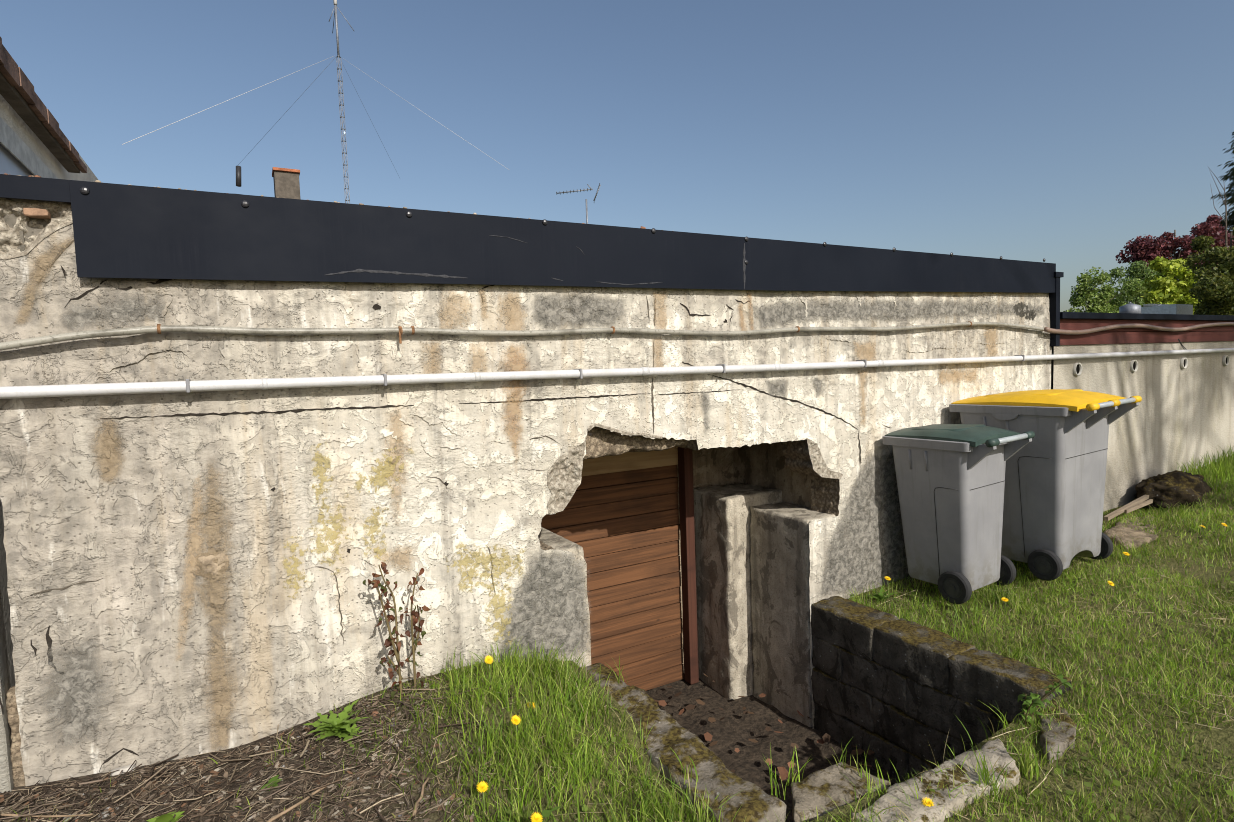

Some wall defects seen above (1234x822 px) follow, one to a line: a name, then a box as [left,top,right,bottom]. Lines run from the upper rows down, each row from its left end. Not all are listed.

spalling [0,198,73,260]
crack [459,293,890,463]
water stain [95,422,122,482]
spalling [547,423,662,514]
spalling [807,438,843,479]
crack [31,578,103,595]
water stain [181,469,233,747]
water stain [382,550,410,569]
crack [31,625,66,675]